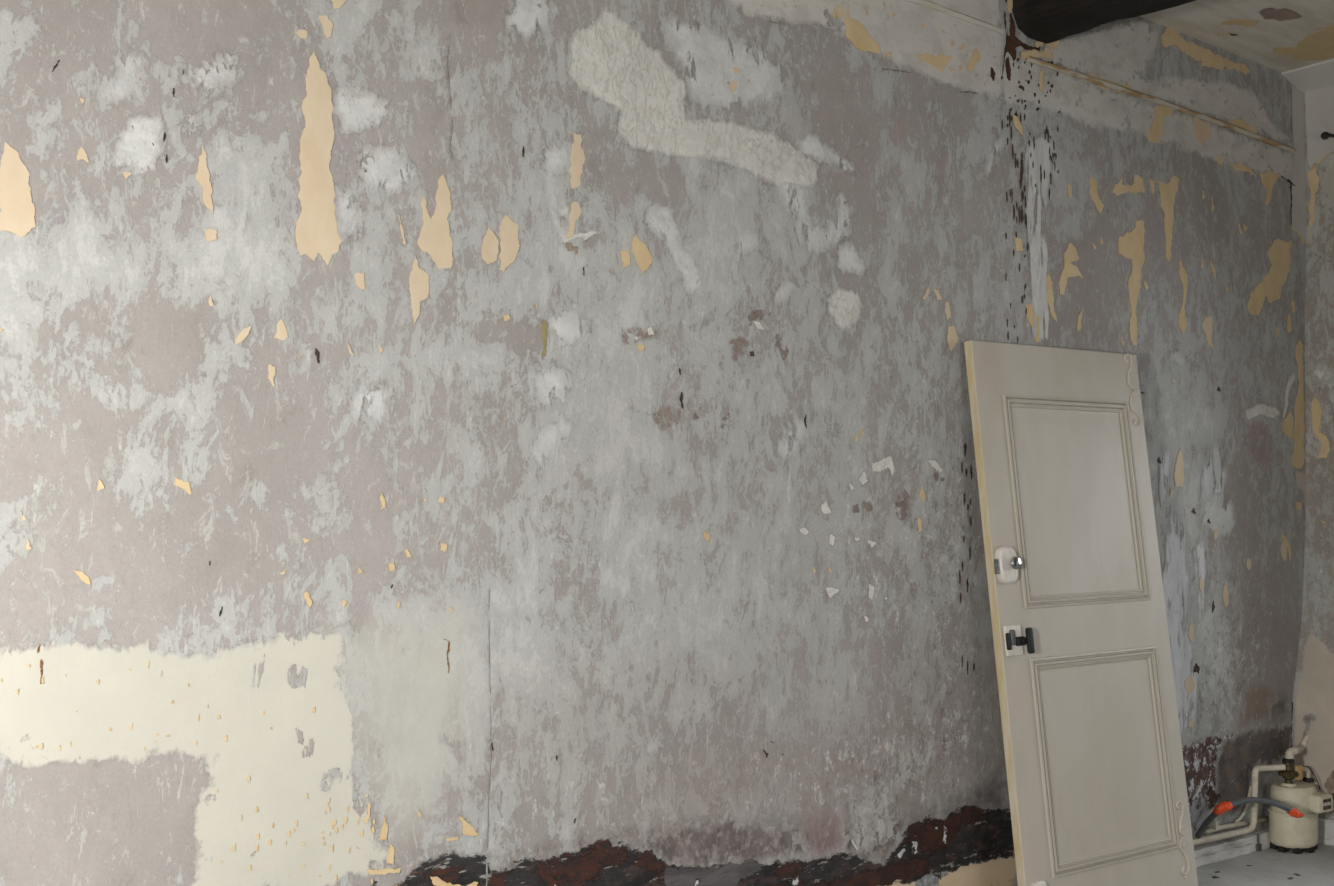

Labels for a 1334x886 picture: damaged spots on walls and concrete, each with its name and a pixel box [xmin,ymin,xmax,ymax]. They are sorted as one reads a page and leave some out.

peeling [0,142,36,238]
peeling [295,0,346,265]
peeling [398,174,453,324]
peeling [481,214,520,272]
peeling [562,133,598,254]
spalling [728,308,789,362]
peeling [727,0,1302,207]
peeling [1026,220,1149,345]
peeling [1089,175,1229,347]
peeling [1245,166,1330,469]
damp [1157,439,1233,816]
damp [483,742,1010,873]